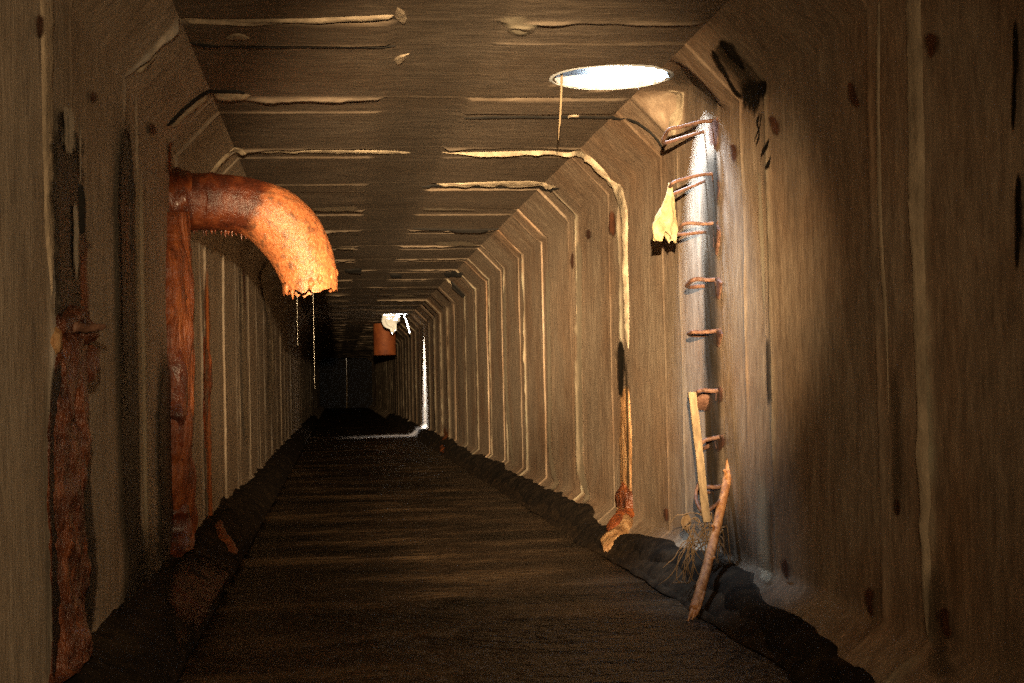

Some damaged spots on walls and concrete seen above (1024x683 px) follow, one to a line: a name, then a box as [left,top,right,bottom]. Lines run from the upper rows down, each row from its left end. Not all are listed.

leakage [712,40,767,113]
crack [1011,22,1019,130]
corrosion [708,117,737,161]
crack [1014,174,1022,267]
corrosion [165,212,246,558]
corrosion [687,386,723,411]
corrosion [47,244,101,683]
corrosion [600,368,635,552]